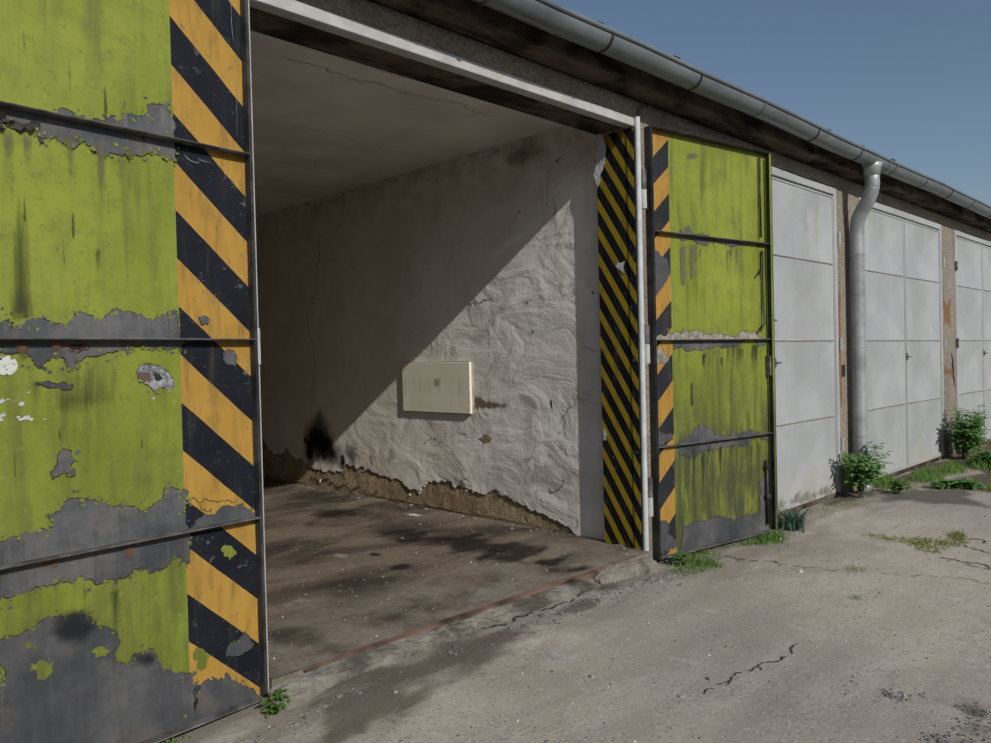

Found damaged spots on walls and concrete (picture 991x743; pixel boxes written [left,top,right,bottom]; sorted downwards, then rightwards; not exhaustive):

peeling [0,96,182,167]
spalling [593,133,606,188]
damp [15,241,27,314]
peeling [0,306,187,421]
peeling [657,329,765,365]
peeling [46,448,81,479]
spalling [262,439,574,534]
peeling [659,425,769,459]
peeling [0,482,255,609]
crack [882,538,991,583]
peeling [0,610,259,743]
crack [704,643,799,694]